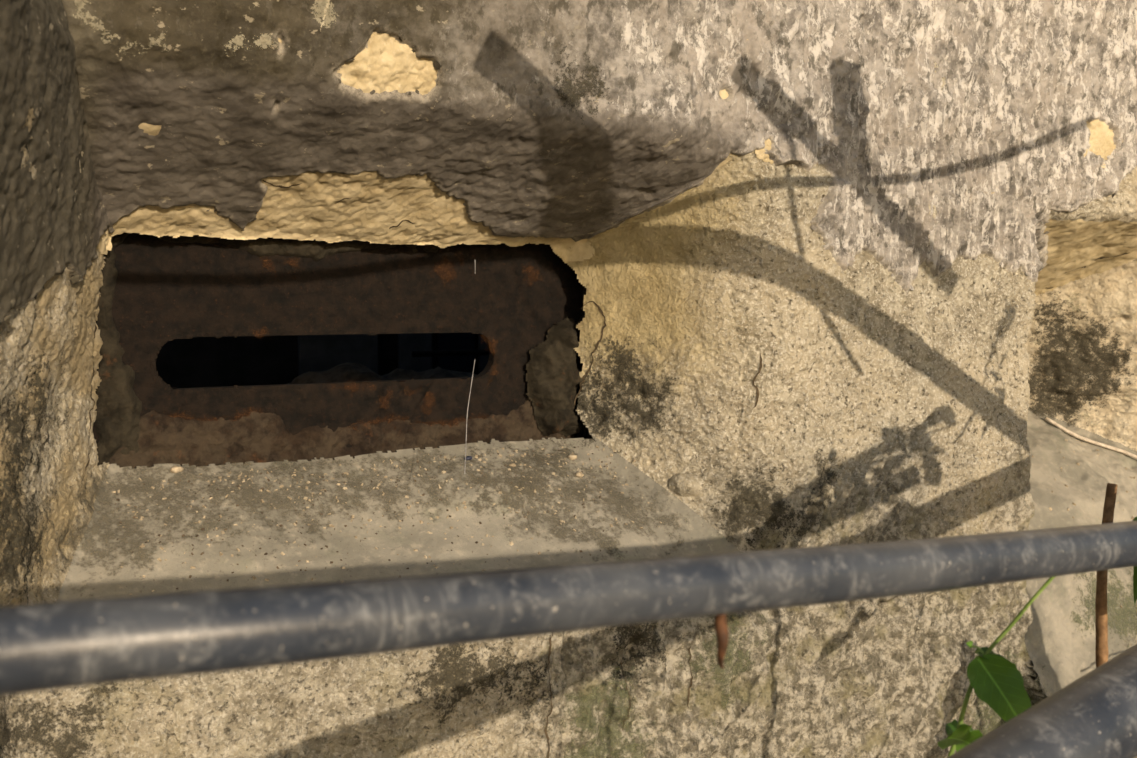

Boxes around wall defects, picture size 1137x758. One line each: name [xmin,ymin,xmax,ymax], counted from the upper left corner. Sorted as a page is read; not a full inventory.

spalling [337,32,441,95]
spalling [755,139,776,164]
spalling [1084,120,1123,168]
spalling [97,171,595,262]
rust [95,232,583,469]
leakage [1028,292,1137,427]
leakage [0,334,683,603]
leakage [708,448,839,550]